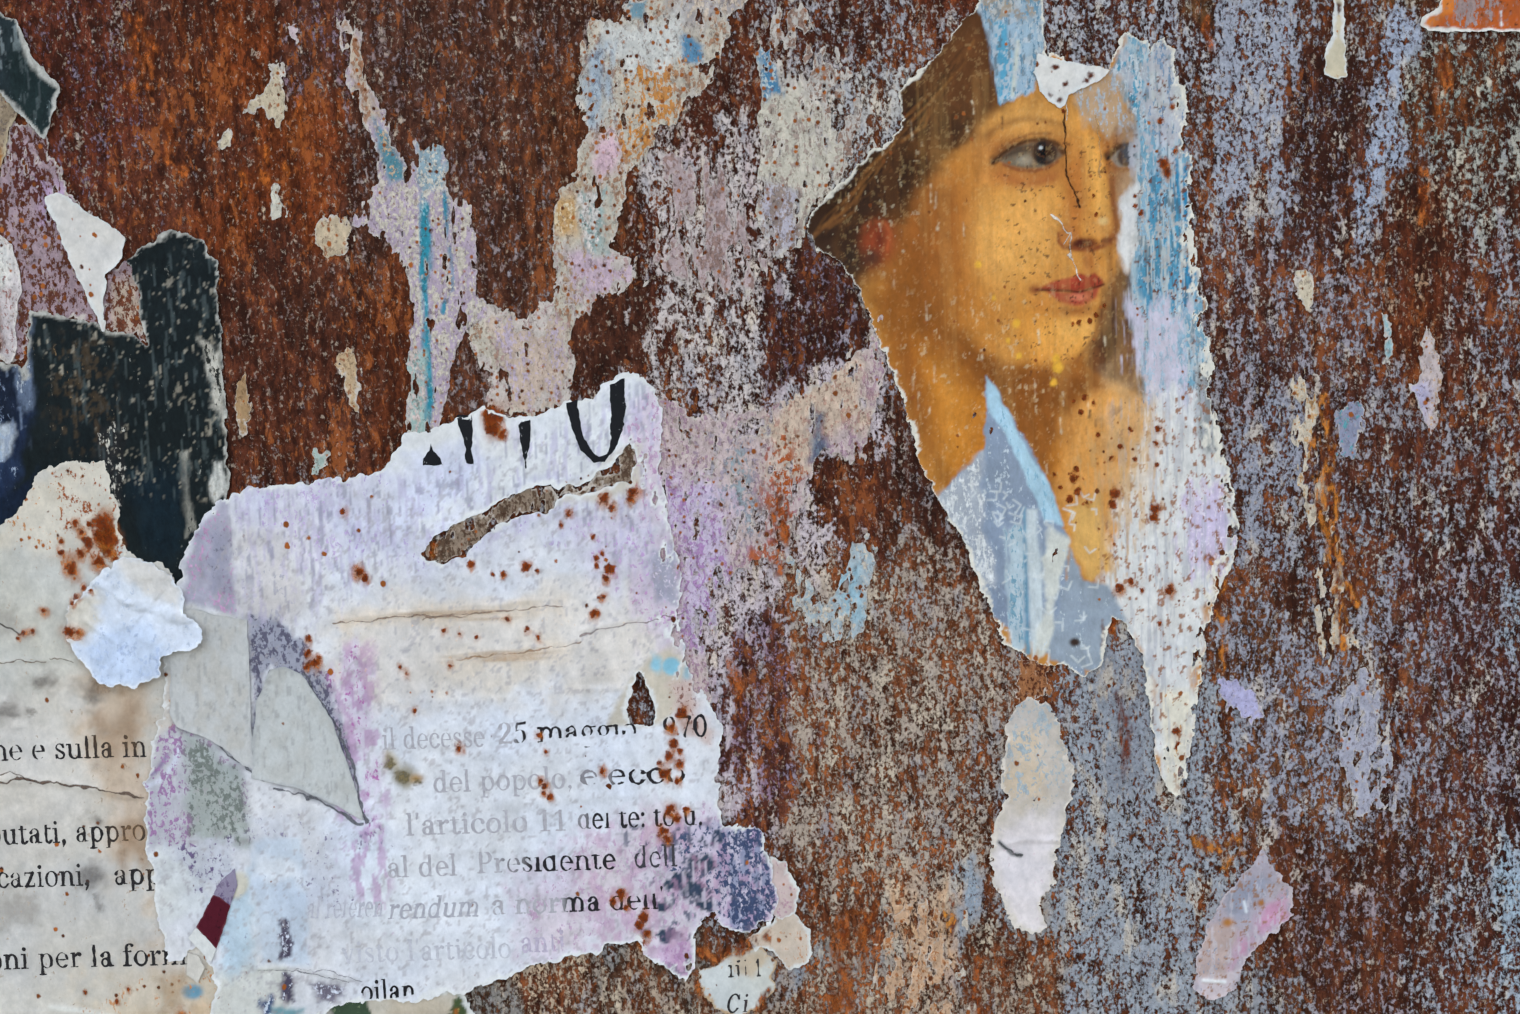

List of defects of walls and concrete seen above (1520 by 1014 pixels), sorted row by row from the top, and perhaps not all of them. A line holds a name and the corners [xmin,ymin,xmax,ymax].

peeling [315,0,877,433]
peeling [0,121,147,364]
peeling [235,372,253,437]
peeling [311,448,331,475]
peeling [425,315,885,702]
corrosion [1053,466,1088,504]
corrosion [1108,489,1120,509]
corrosion [1149,504,1160,521]
corrosion [1309,393,1359,651]
corrosion [1115,578,1144,594]
peeling [1218,678,1265,726]
corrosion [696,933,771,964]